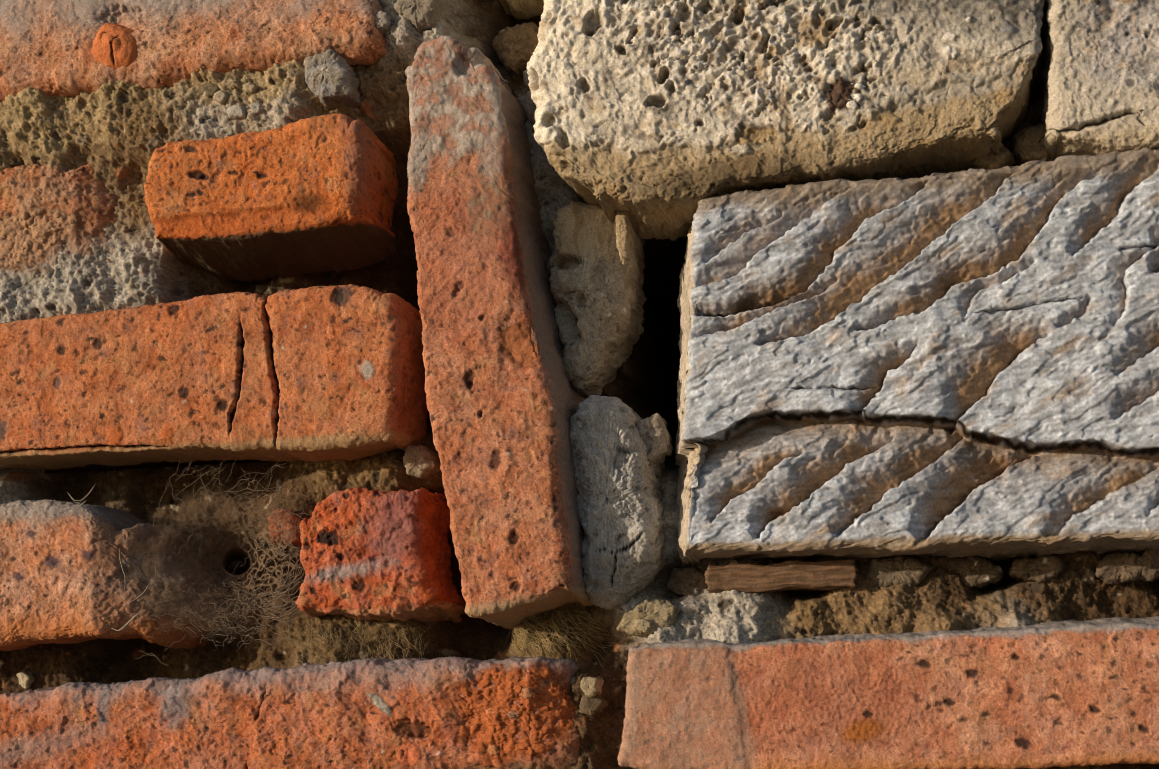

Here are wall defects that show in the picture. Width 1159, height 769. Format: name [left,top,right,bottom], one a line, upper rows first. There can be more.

crack [229,300,280,445]
crack [696,296,791,317]
crack [679,353,1159,521]
crack [974,298,1082,314]